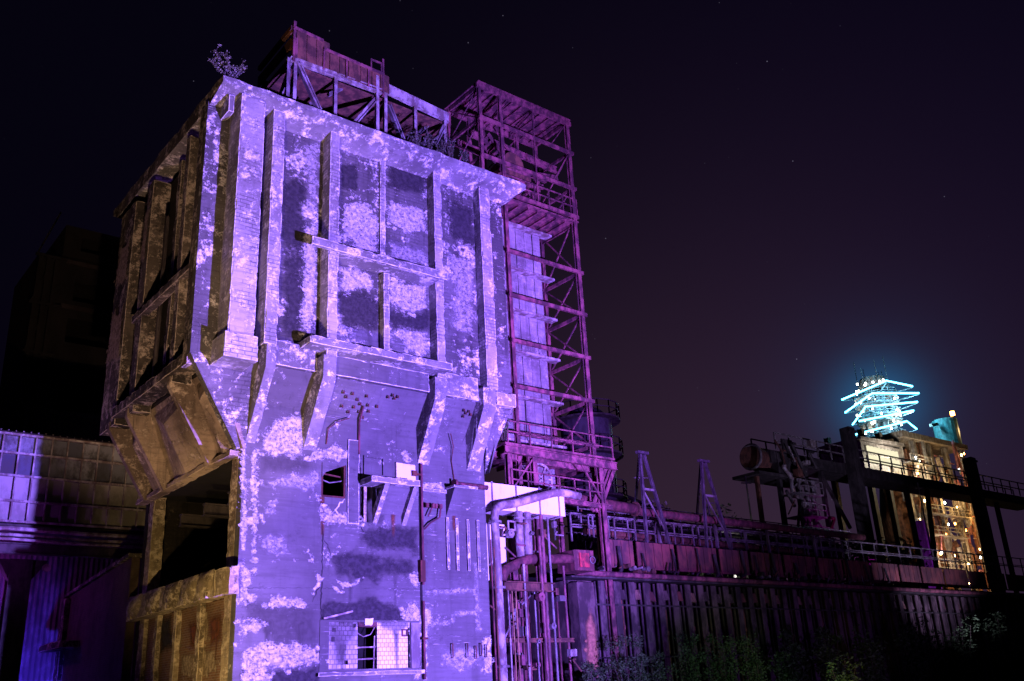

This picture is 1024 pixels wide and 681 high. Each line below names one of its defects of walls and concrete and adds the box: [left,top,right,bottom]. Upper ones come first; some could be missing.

peeling [338,196,428,263]
damp [387,166,427,192]
peeling [234,412,365,681]
damp [254,499,417,665]